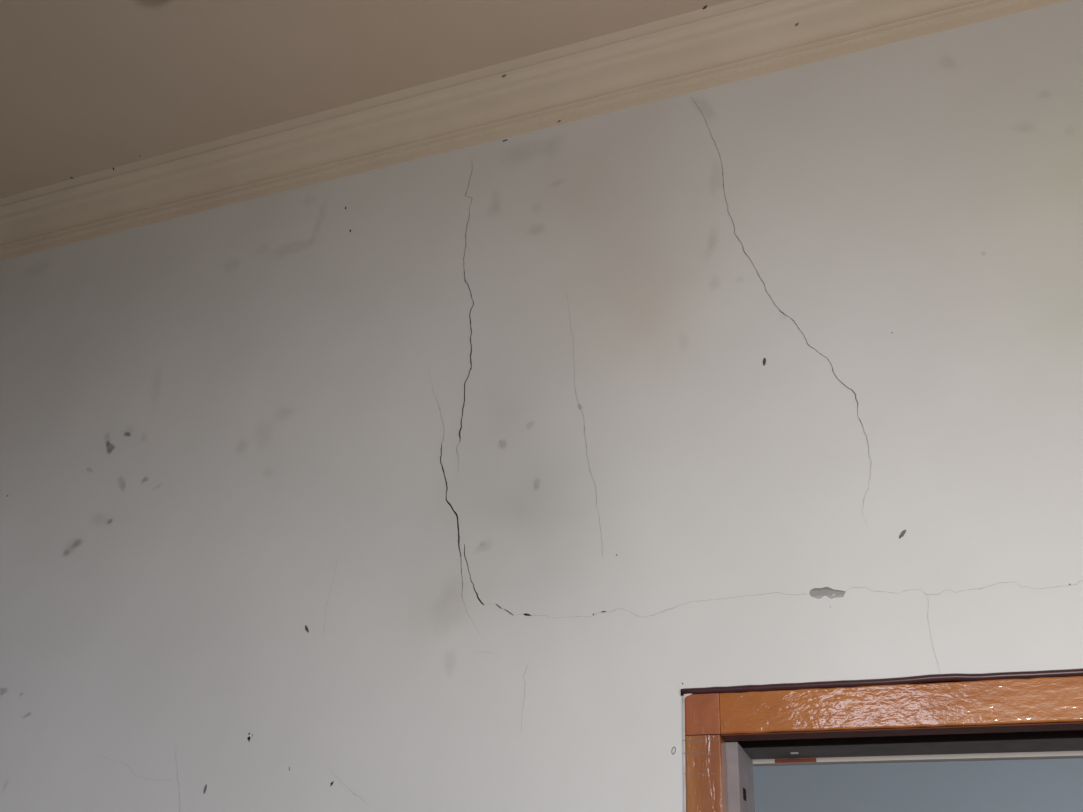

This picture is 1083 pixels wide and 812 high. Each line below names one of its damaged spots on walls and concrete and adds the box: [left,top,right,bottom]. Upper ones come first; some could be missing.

crack [440,169,513,615]
crack [698,107,870,458]
flaking render [810,587,846,599]